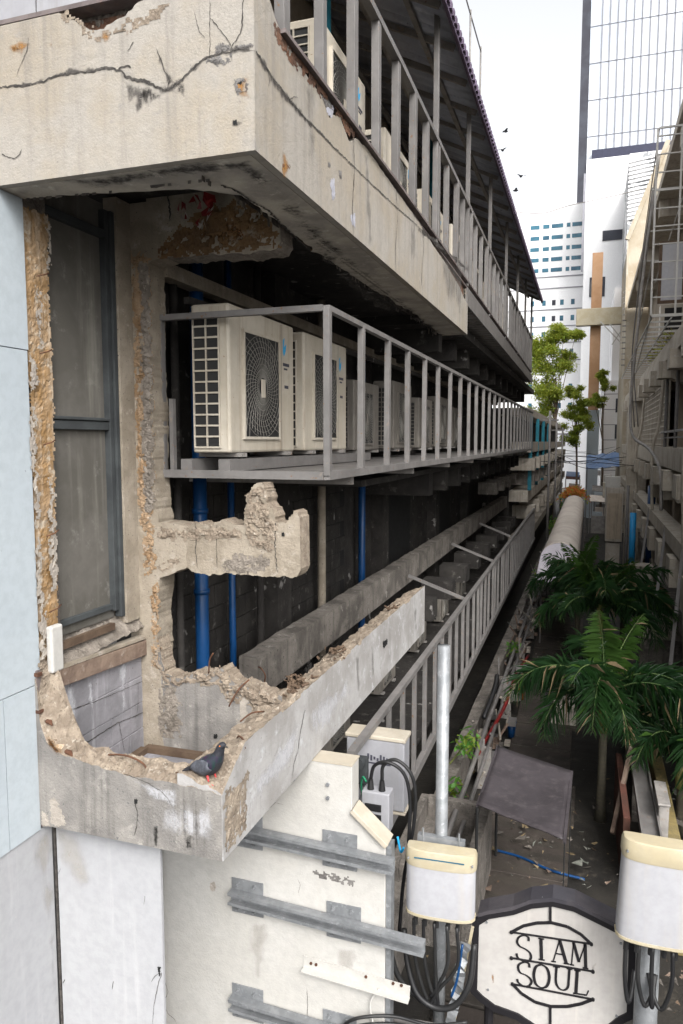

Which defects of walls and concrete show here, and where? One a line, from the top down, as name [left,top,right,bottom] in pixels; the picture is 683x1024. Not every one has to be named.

spalling [61,3,169,42]
crack [0,0,468,279]
spalling [234,195,279,228]
peeling [22,195,62,661]
peeling [131,251,181,669]
spalling [221,553,270,575]
spalling [158,684,183,739]
peeling [227,679,264,749]